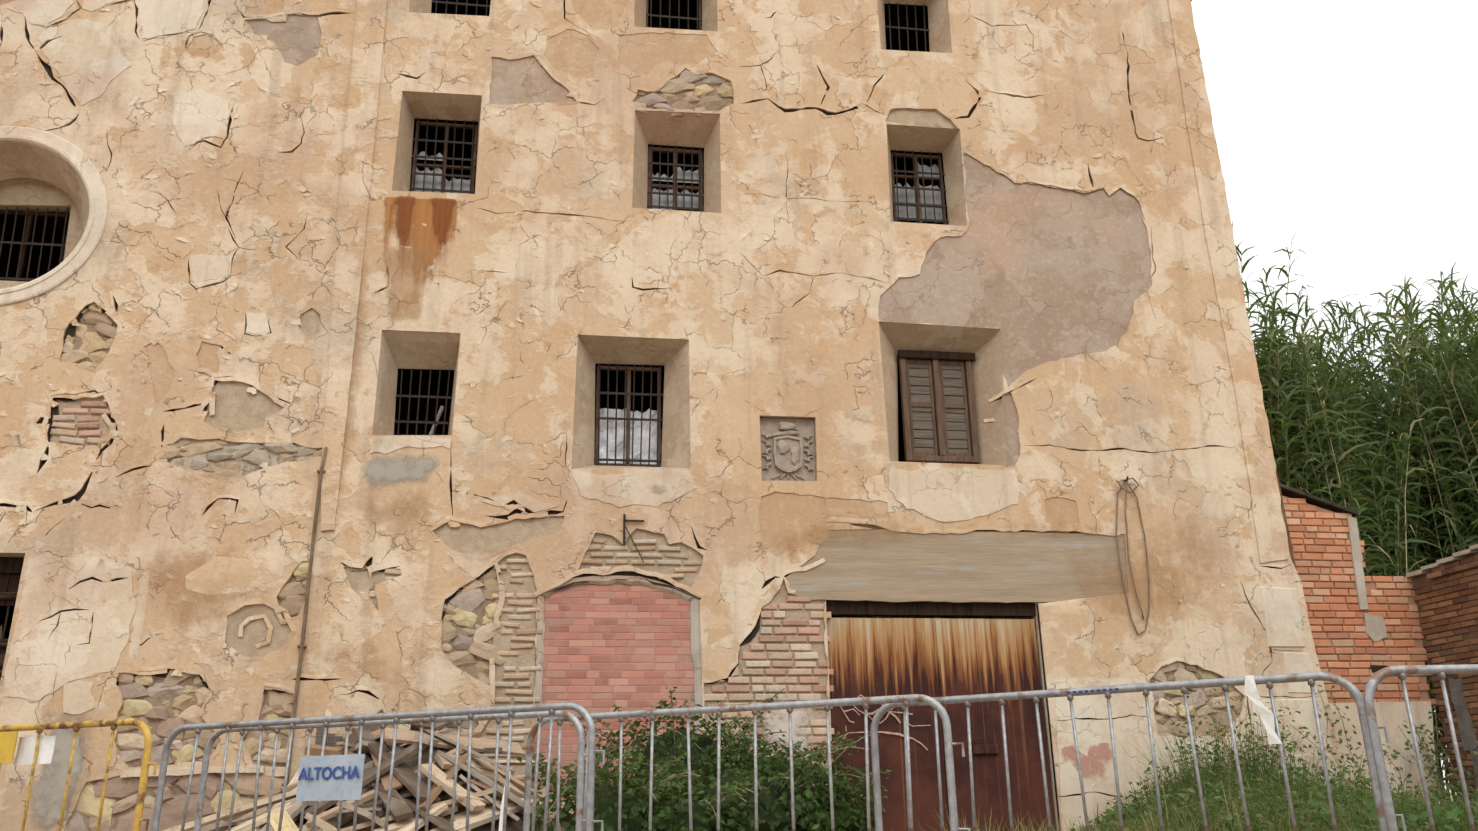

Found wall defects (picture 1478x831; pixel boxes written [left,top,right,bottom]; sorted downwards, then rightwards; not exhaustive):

crack [0,0,353,131]
crack [190,106,233,150]
peeling [486,0,737,120]
crack [739,55,885,116]
spalling [0,0,347,557]
crack [188,184,239,290]
rust [384,196,458,280]
crack [0,295,292,512]
spalling [572,470,719,587]
peeling [700,152,1155,786]
peeling [3,499,312,831]
peeling [1054,657,1328,831]